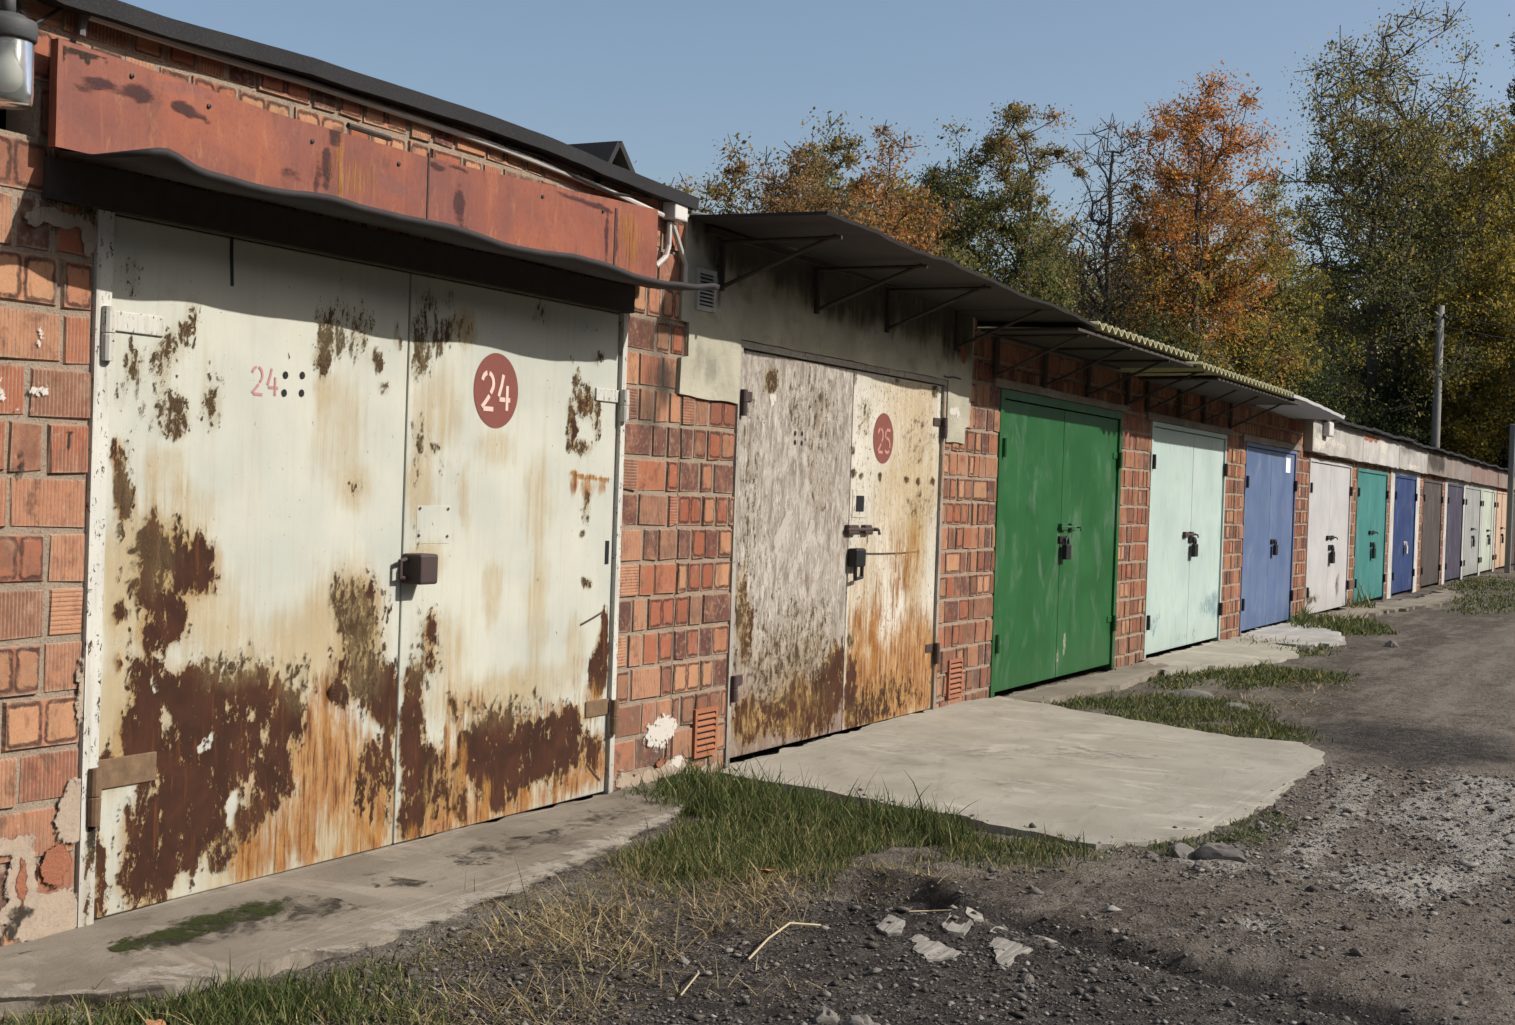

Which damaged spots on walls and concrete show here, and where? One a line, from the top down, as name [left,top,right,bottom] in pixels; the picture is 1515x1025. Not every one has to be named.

rust [63,46,108,65]
rust [315,127,343,198]
rust [454,192,465,221]
rust [571,471,609,536]
rust [731,535,937,755]
rust [94,505,609,919]
spalling [0,777,96,943]